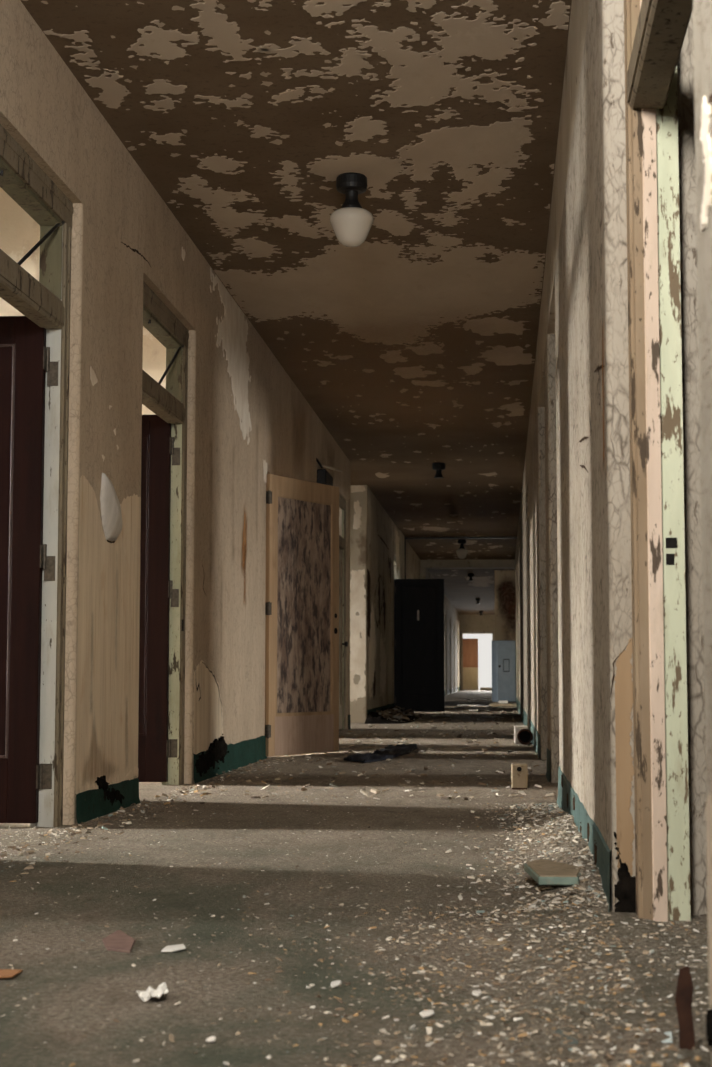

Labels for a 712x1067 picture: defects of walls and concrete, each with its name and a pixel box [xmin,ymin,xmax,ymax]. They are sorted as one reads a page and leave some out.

peeling [43,0,570,461]
peeling [75,475,141,797]
peeling [350,472,521,702]